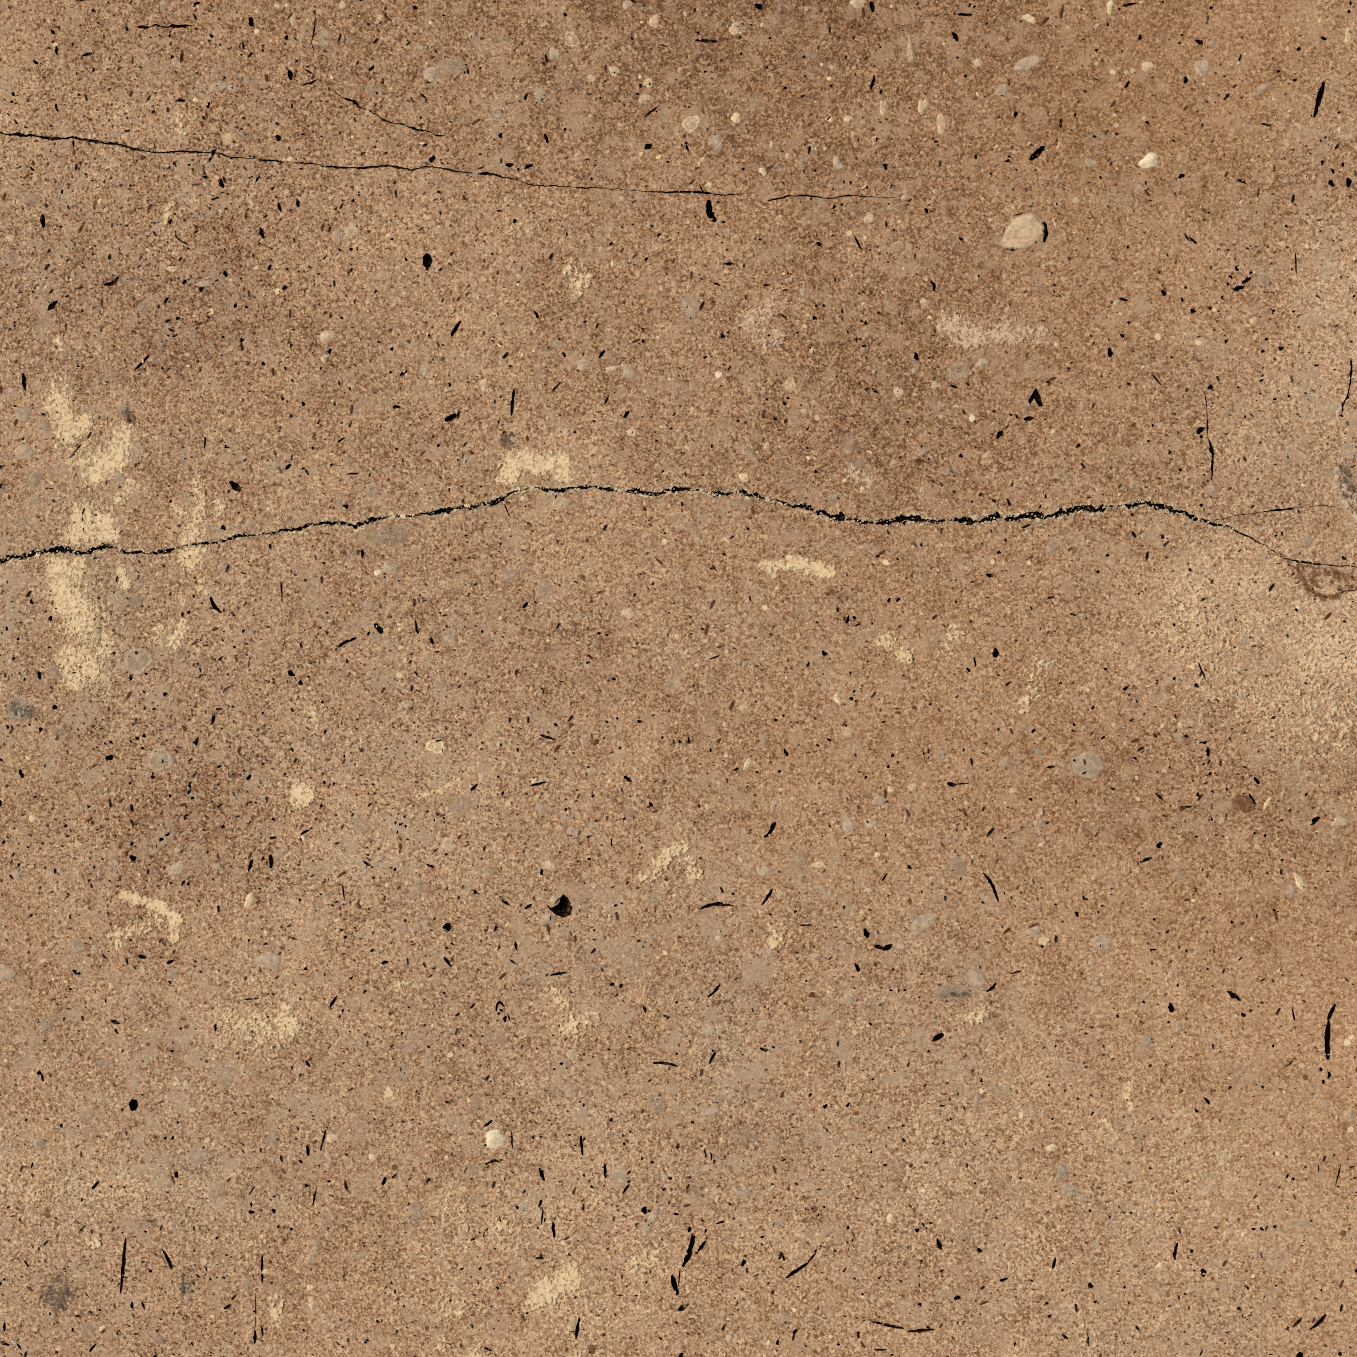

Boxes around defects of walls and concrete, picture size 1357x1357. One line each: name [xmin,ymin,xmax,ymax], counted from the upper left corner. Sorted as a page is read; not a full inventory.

crack [0,7,894,201]
crack [1204,391,1215,480]
crack [0,480,1357,599]